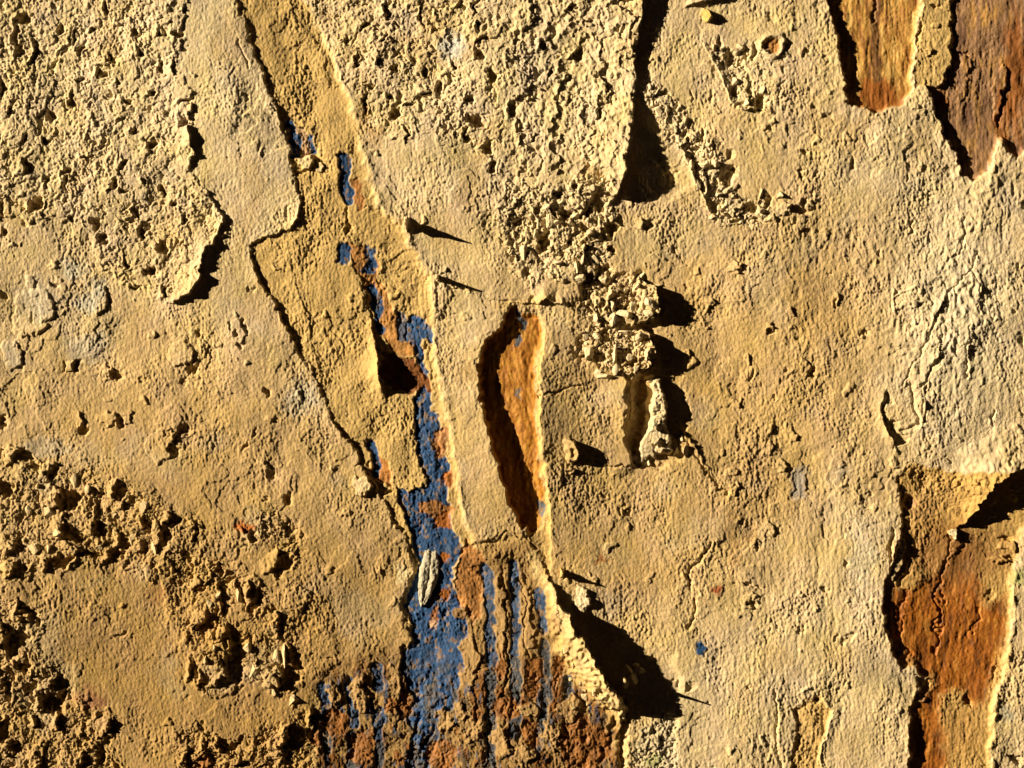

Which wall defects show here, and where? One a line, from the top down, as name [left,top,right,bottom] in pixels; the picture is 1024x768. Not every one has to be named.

crack [236,38,251,71]
flaking render [0,0,691,768]